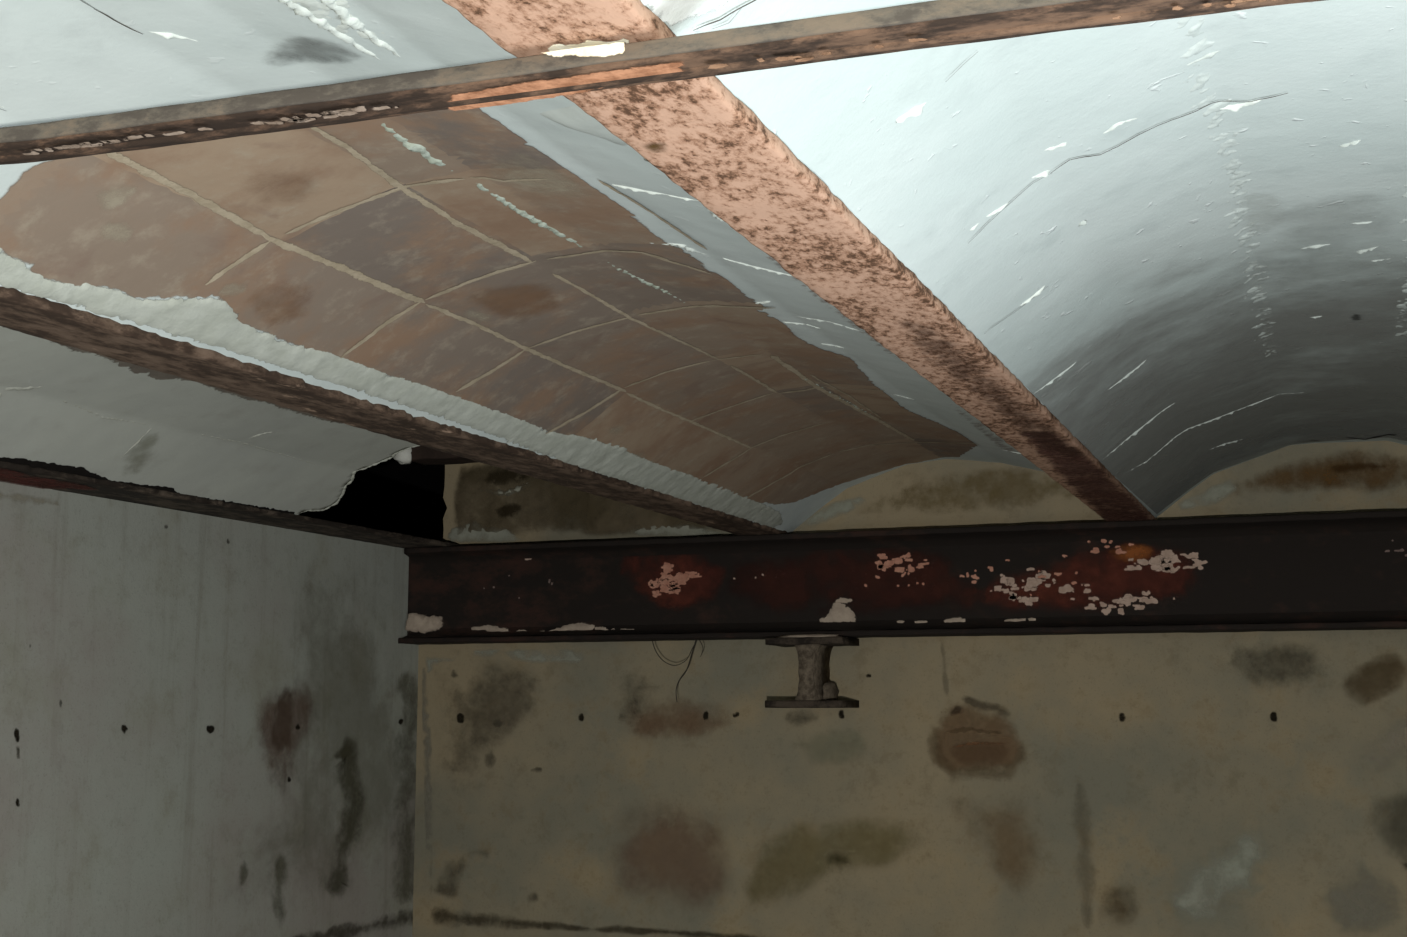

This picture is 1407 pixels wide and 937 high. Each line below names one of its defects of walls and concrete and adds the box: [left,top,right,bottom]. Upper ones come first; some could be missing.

corrosion [448,62,684,111]
peeling [0,106,979,505]
corrosion [904,324,1148,521]
spalling [173,445,704,548]
corrosion [627,556,722,606]
corrosion [740,545,1189,607]
damp [1348,660,1402,699]
damp [336,740,363,850]